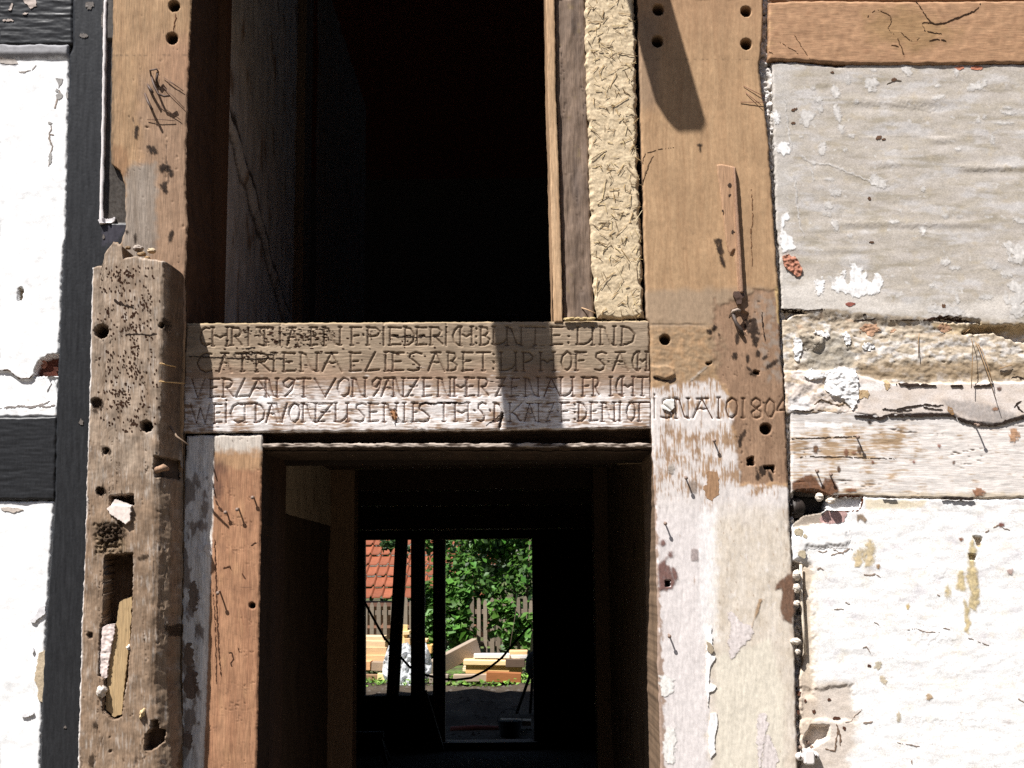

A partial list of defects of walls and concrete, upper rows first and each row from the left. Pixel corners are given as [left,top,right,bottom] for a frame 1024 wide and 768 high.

crack [868,1,981,55]
peeling [772,71,855,156]
peeling [779,212,802,277]
peeling [814,263,883,306]
peeling [927,294,964,333]
peeling [793,324,896,362]
peeling [804,366,870,410]
crack [791,376,1024,459]
peeling [703,471,719,501]
flaking render [820,511,847,524]
peeling [658,675,675,697]
peeling [663,726,677,764]